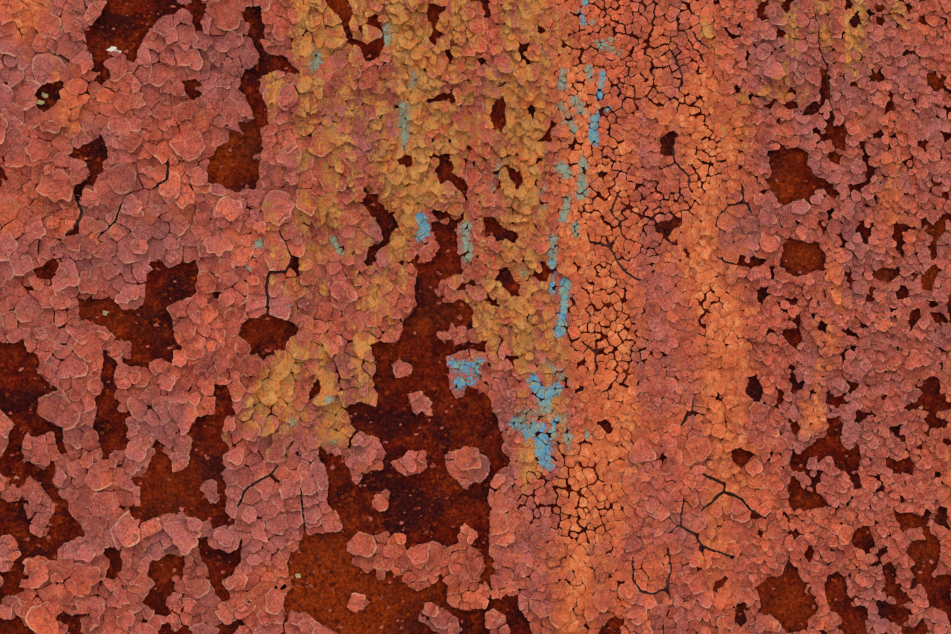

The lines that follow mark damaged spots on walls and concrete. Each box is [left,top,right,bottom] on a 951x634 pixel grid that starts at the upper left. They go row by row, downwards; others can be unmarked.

corrosion [50,63,81,132]
crack [661,49,683,89]
corrosion [812,0,874,88]
crack [587,191,640,281]
crack [663,145,691,191]
crack [715,185,751,226]
corrosion [237,0,649,634]
crack [581,341,607,370]
corrosion [627,0,812,591]
corrosion [792,320,837,443]
corrosion [818,259,850,312]
crack [632,473,761,599]